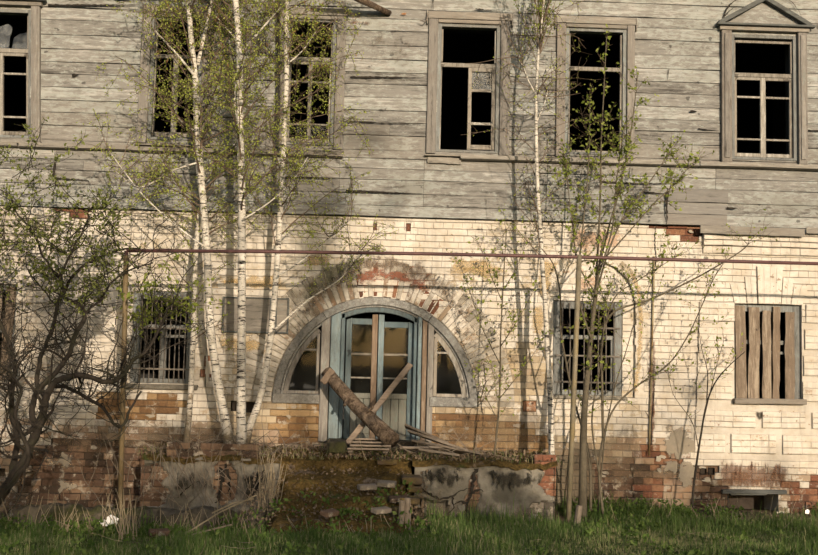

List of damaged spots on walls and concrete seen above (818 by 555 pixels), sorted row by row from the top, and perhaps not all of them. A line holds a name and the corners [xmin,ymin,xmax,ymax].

spalling [18,438,259,508]
crack [422,468,483,515]
spalling [587,425,728,512]